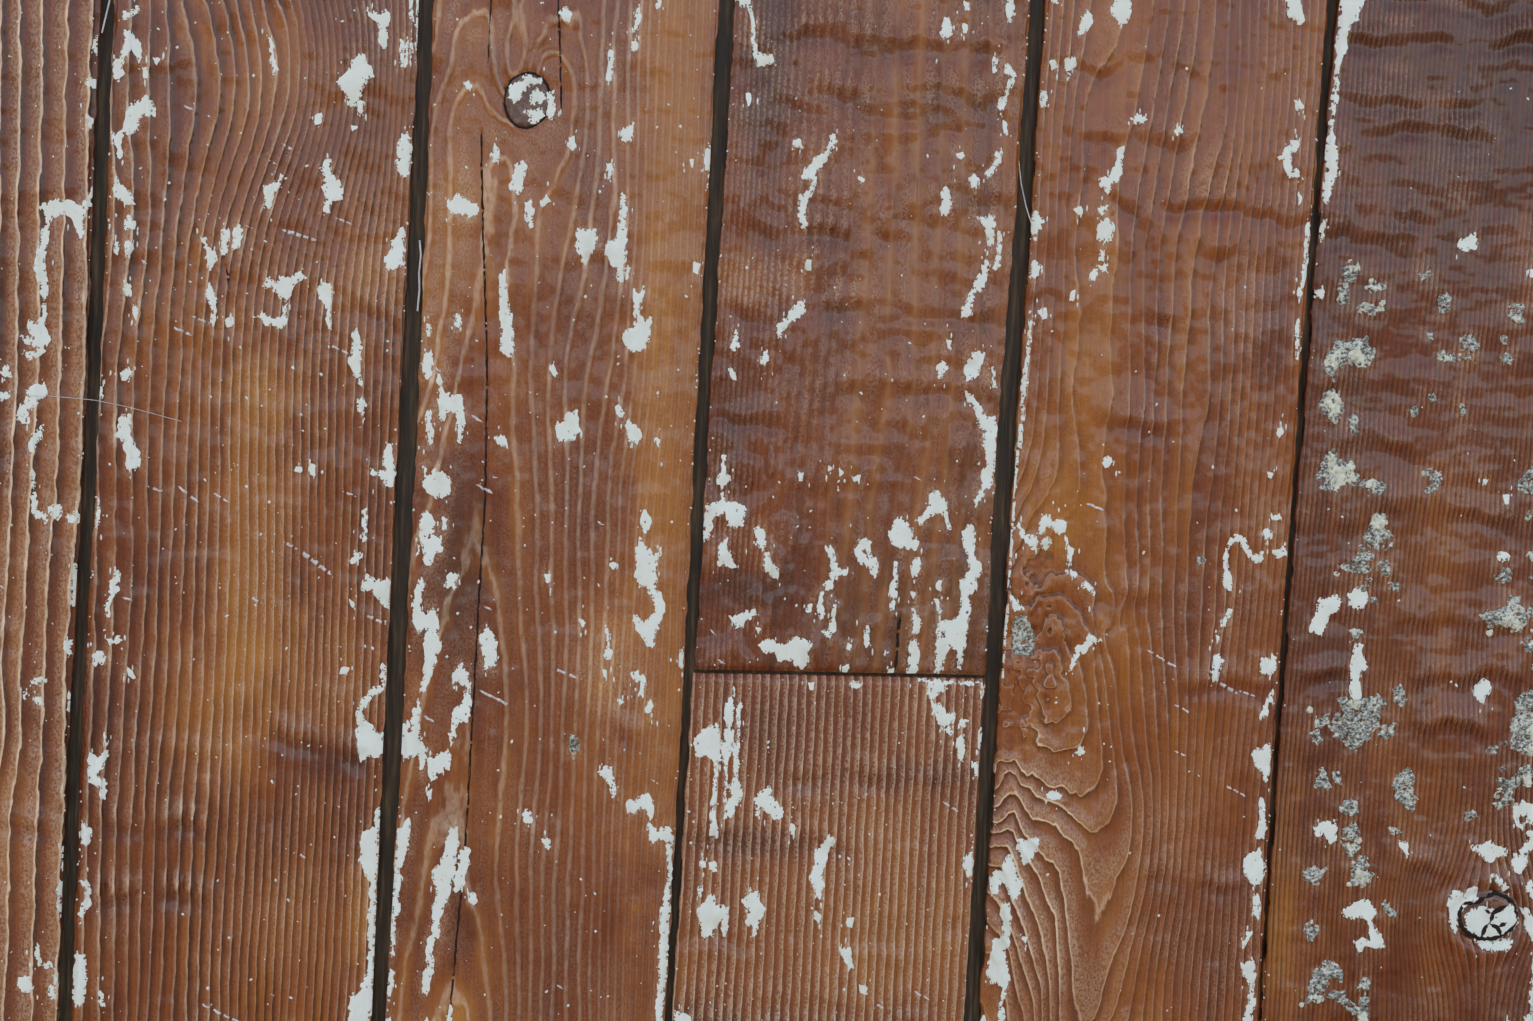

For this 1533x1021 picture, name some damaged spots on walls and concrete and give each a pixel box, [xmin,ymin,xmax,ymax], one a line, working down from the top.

peeling [1297,0,1387,316]
peeling [0,186,101,529]
peeling [401,466,499,781]
peeling [758,349,998,776]
spalling [1306,448,1408,753]
peeling [348,807,411,1021]
peeling [422,826,478,996]
peeling [598,765,691,1021]
peeling [693,695,796,839]
peeling [962,837,1039,1021]
peeling [1240,743,1272,1021]
peeling [1446,690,1533,952]